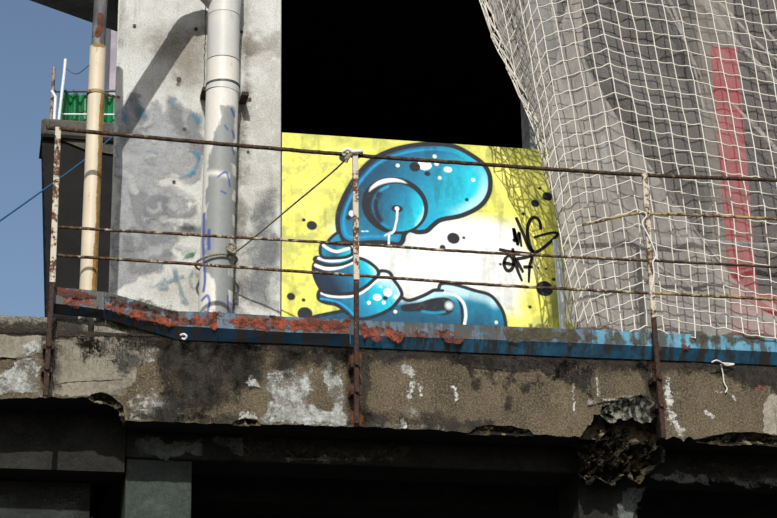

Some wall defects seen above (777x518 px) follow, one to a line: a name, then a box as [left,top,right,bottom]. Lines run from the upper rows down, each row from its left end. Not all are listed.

rust [55,93,464,344]
peeling [0,339,43,397]
spalling [89,393,126,422]
peeling [233,357,348,426]
damp [0,318,693,437]
damp [677,362,777,394]
peeling [135,436,245,461]
spalling [573,396,666,518]